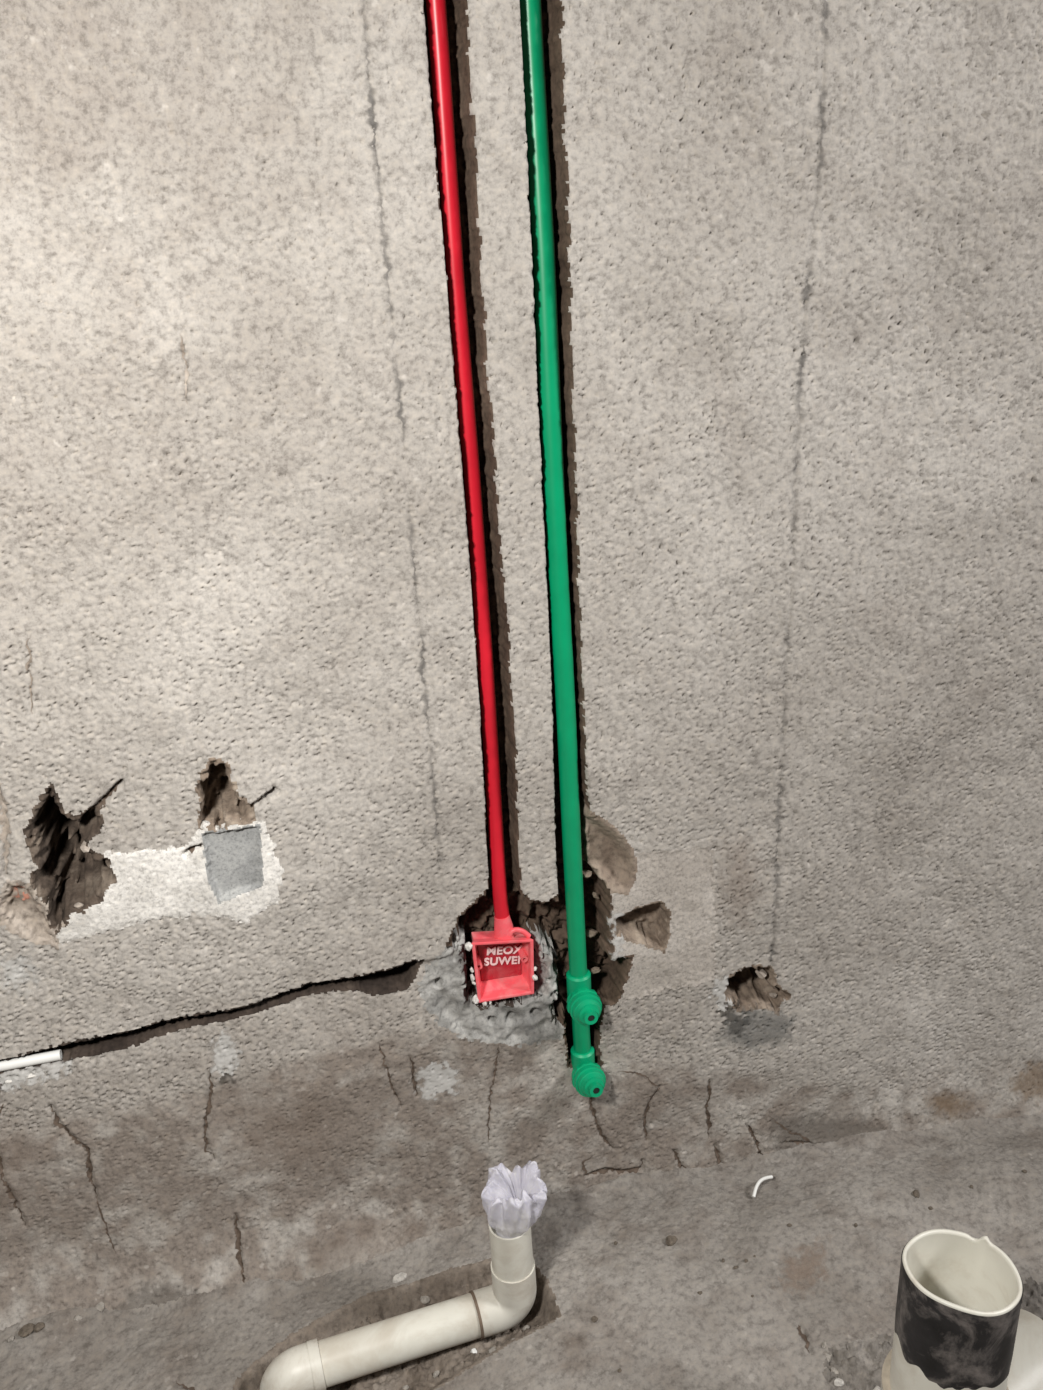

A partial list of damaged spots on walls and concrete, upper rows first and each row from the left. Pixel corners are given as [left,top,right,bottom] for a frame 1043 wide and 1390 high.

spalling [195,757,275,832]
spalling [0,779,121,950]
crack [0,959,424,1113]
spalling [446,848,573,1068]
spalling [579,787,671,1068]
spalling [723,964,791,1016]
crack [0,1156,26,1225]
crack [50,1106,116,1252]
crack [203,1072,215,1159]
crack [582,1071,721,1175]
crack [748,1115,812,1155]
crack [234,1213,246,1282]